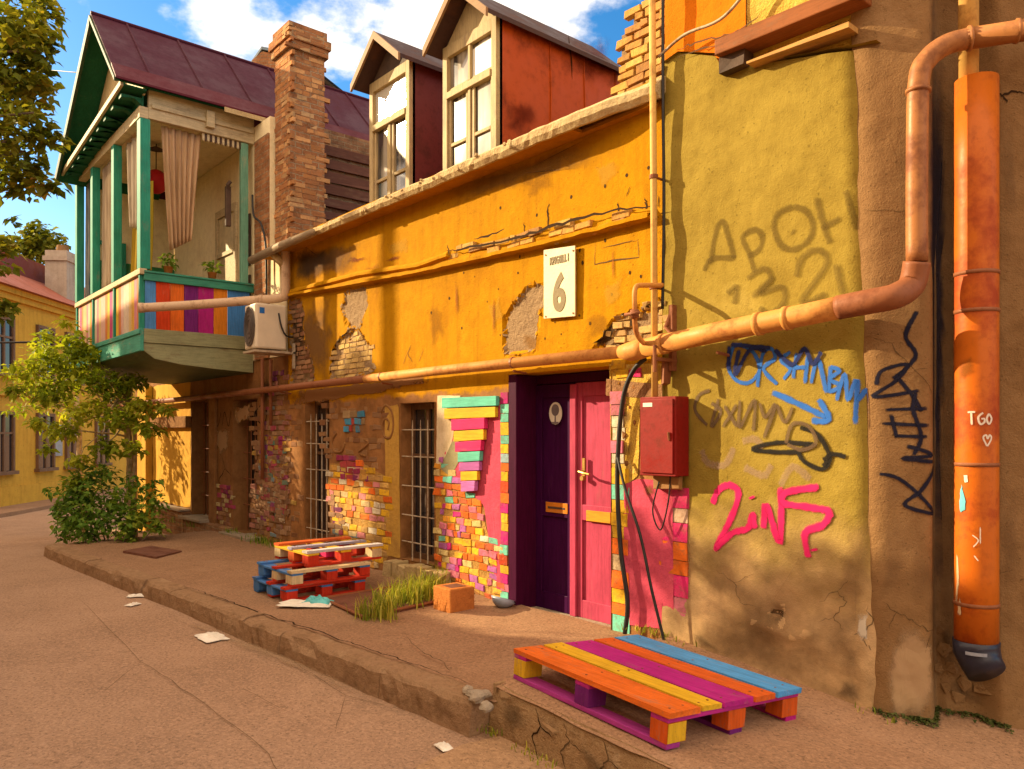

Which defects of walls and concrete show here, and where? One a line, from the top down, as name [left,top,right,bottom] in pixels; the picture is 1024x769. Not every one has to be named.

crack [447,187,659,254]
crack [594,240,639,265]
flaking render [502,280,546,356]
spalling [593,298,668,349]
flaking render [235,286,424,469]
crack [819,579,933,653]
crack [531,708,618,769]